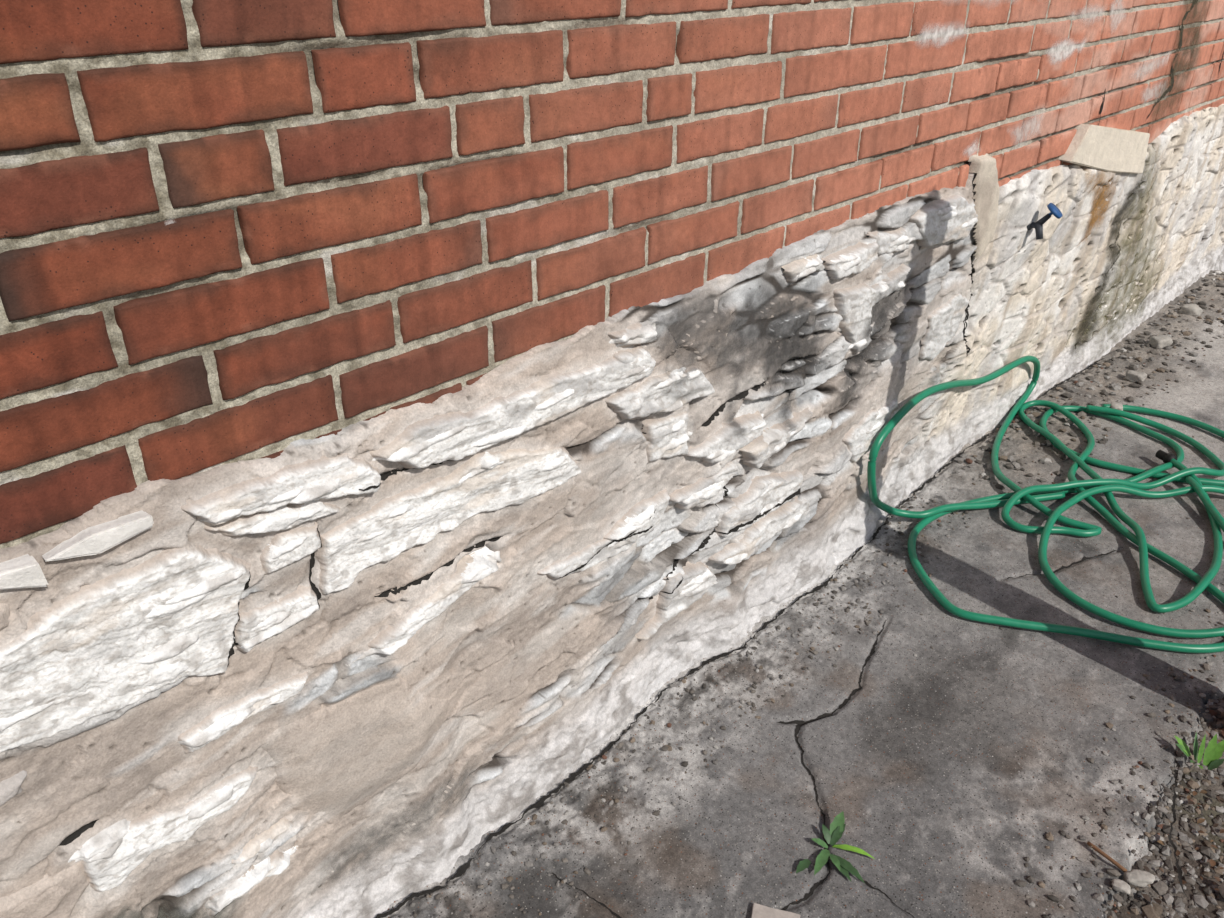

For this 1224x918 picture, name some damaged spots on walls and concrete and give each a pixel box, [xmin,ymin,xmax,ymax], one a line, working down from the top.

water stain [923,26,964,43]
water stain [1050,41,1084,61]
water stain [843,281,906,404]
crack [963,253,975,357]
water stain [1075,188,1138,347]
crack [359,460,454,491]
crack [309,528,322,608]
crack [374,358,1116,918]
crack [58,819,99,846]